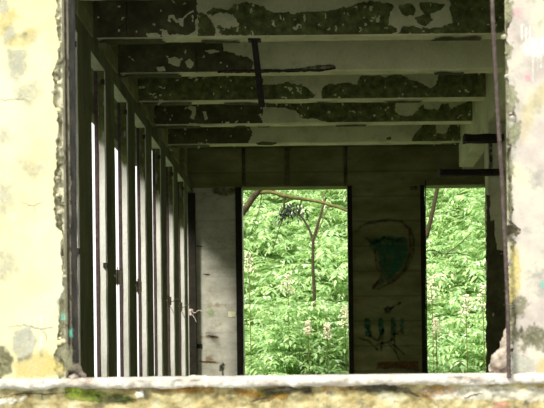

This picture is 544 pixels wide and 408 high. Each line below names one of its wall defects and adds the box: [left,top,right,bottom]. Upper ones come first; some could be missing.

damp [0,32,94,379]
spalling [51,0,73,378]
damp [96,391,144,403]
flaking render [95,0,519,378]
damp [508,248,527,317]
damp [510,323,544,374]